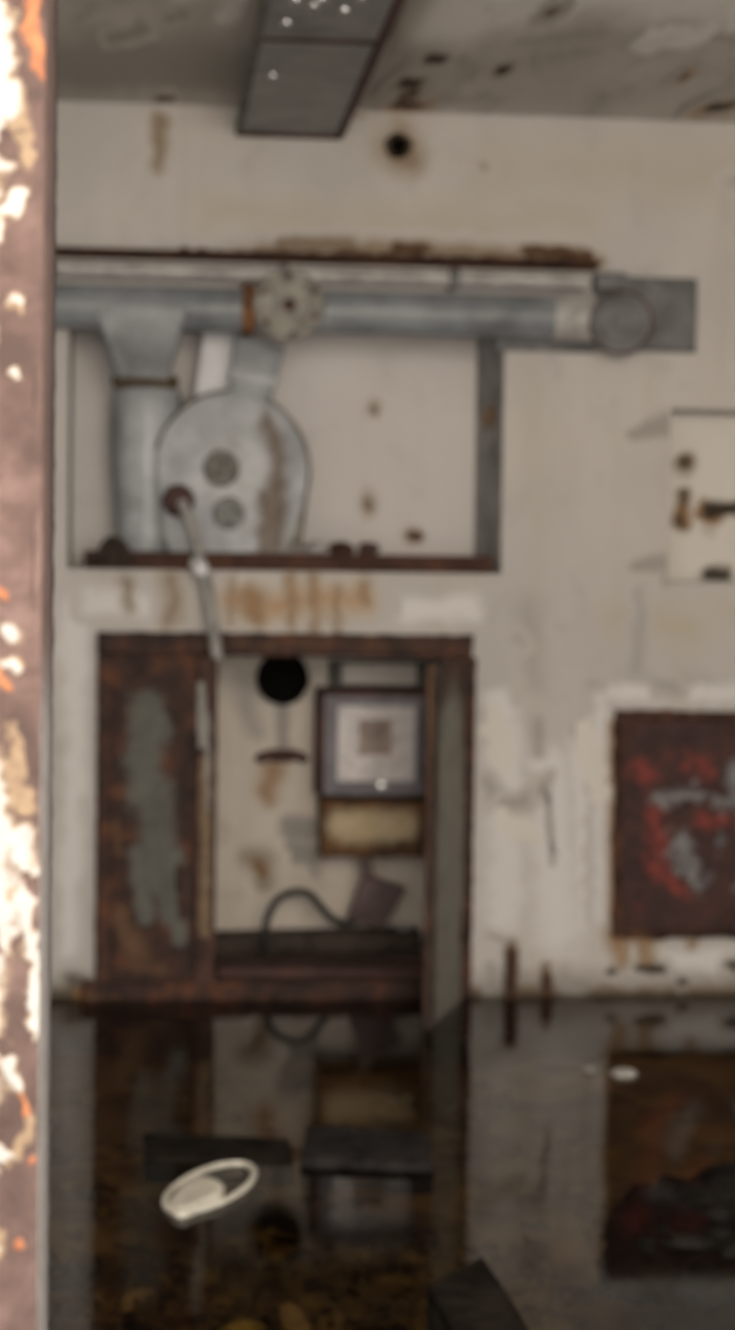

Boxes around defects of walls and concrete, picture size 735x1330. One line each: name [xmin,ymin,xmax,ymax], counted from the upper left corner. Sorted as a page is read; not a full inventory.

rust [222,222,615,283]
rust [669,481,701,542]
rust [124,570,403,635]